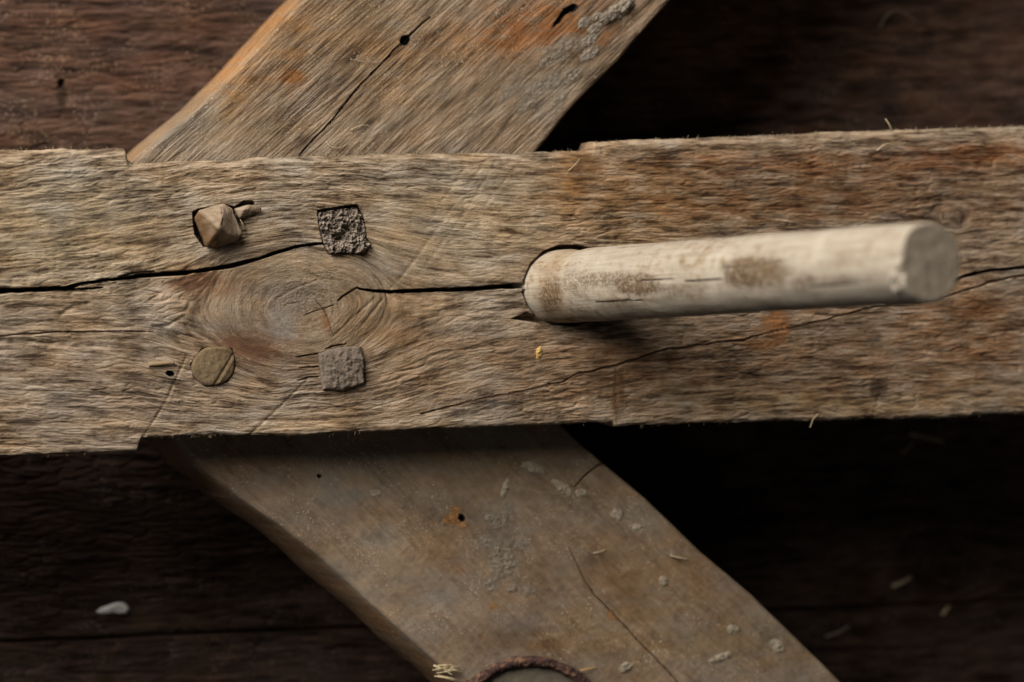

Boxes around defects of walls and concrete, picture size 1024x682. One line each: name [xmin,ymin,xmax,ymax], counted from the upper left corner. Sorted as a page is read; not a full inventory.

crack [298,17,430,157]
crack [0,242,323,293]
crack [603,262,786,303]
crack [945,266,1024,298]
crack [421,304,907,414]
crack [569,547,677,681]